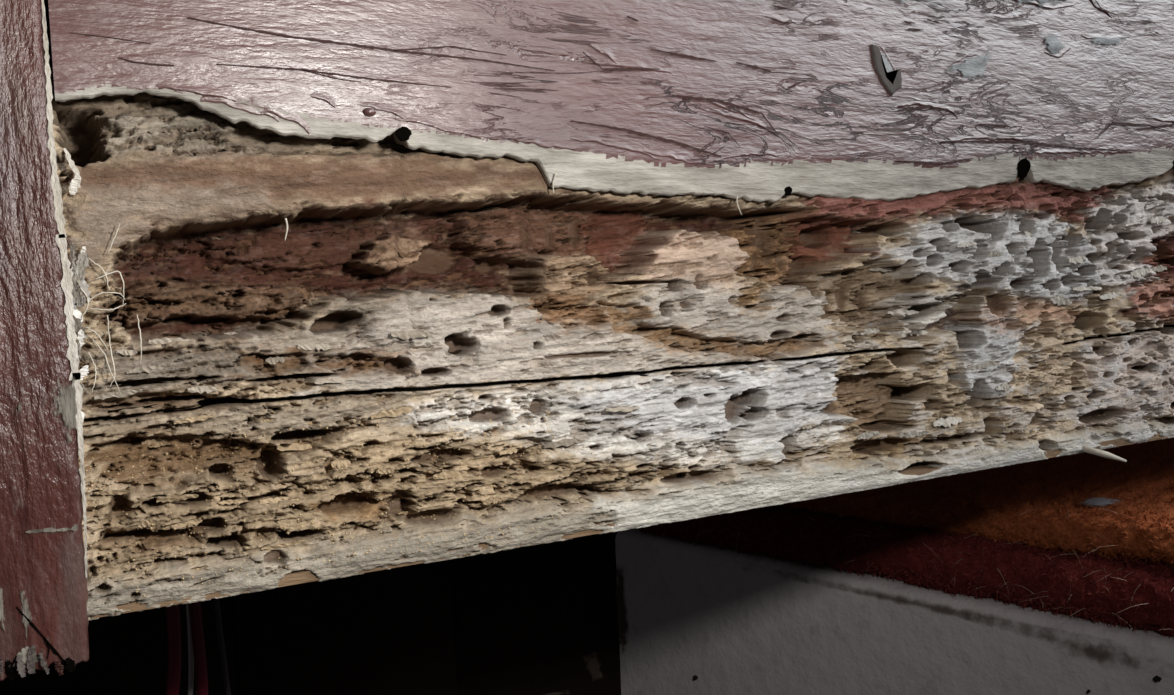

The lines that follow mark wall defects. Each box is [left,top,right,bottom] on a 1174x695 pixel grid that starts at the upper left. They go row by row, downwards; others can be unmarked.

peeling [155,79,311,134]
peeling [311,91,336,108]
peeling [357,99,782,165]
spalling [54,243,143,444]
peeling [116,337,195,374]
crack [1064,325,1174,344]
peeling [187,386,218,394]
crack [94,348,925,413]
peeling [898,416,962,438]
peeling [277,443,312,451]
peeling [218,485,329,505]
peeling [131,517,203,546]